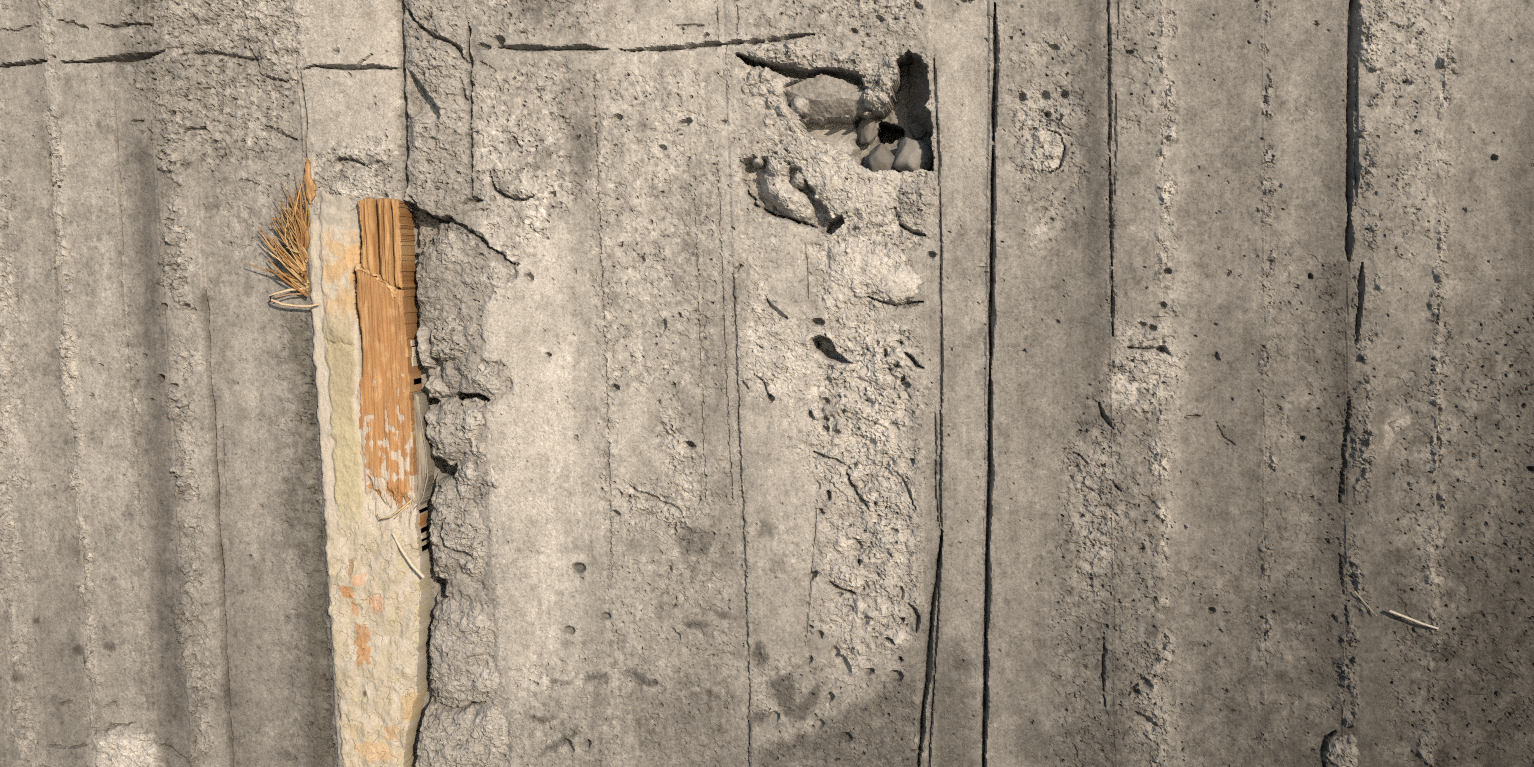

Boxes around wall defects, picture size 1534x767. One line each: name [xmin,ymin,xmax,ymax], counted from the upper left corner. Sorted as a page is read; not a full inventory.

spalling [313,0,558,767]
crack [465,0,817,573]
crack [672,628,684,643]
crack [693,169,810,767]
spalling [735,0,942,744]
crack [909,2,1002,767]
crack [1337,554,1351,627]
crack [1336,397,1354,505]
crack [1340,0,1414,346]